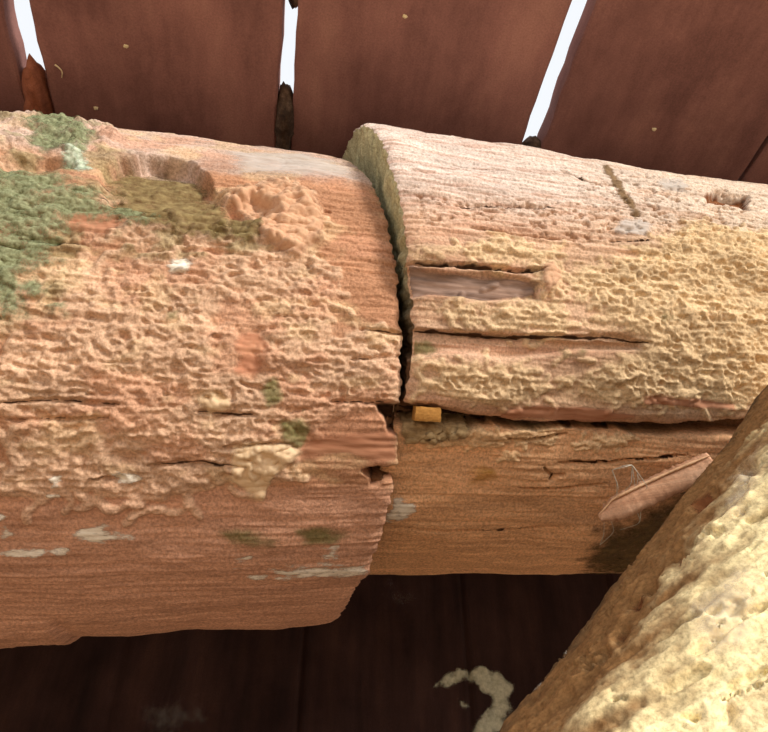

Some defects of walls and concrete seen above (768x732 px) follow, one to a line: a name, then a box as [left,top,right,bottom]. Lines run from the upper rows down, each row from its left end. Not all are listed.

peeling [409,265,536,300]
crack [414,329,649,343]
crack [3,399,82,420]
crack [162,459,235,467]